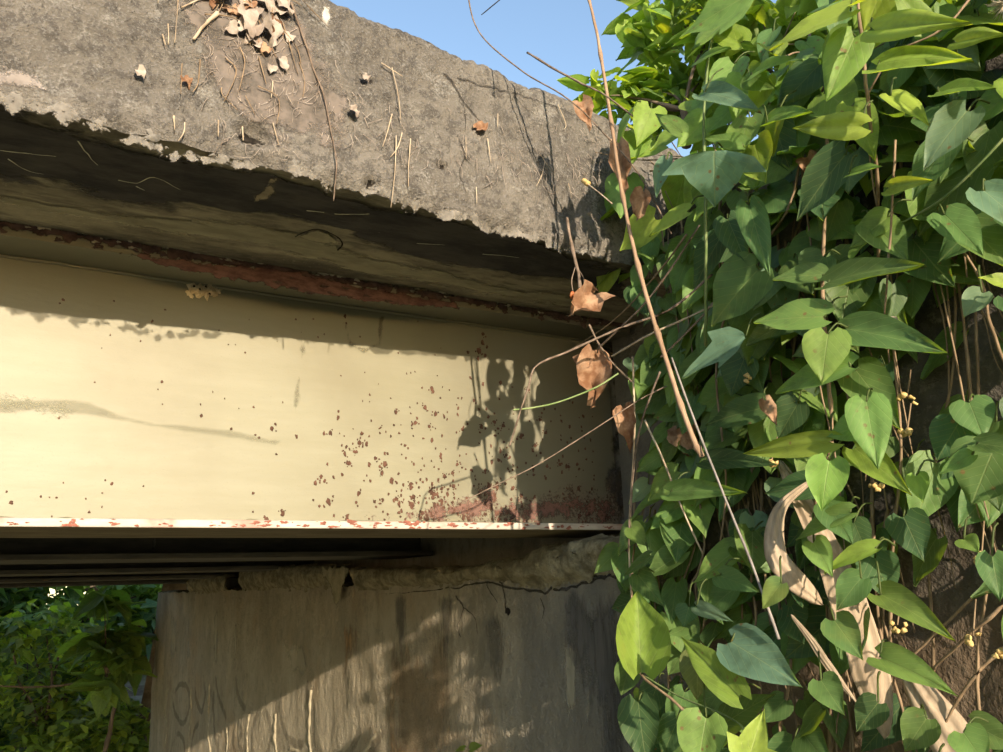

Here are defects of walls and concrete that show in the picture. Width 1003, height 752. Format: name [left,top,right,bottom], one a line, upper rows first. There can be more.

spalling [0,92,110,132]
spalling [121,128,267,170]
leakage [0,105,629,321]
corrosion [0,221,629,328]
corrosion [603,341,615,384]
corrosion [209,375,624,530]
crack [391,573,616,637]